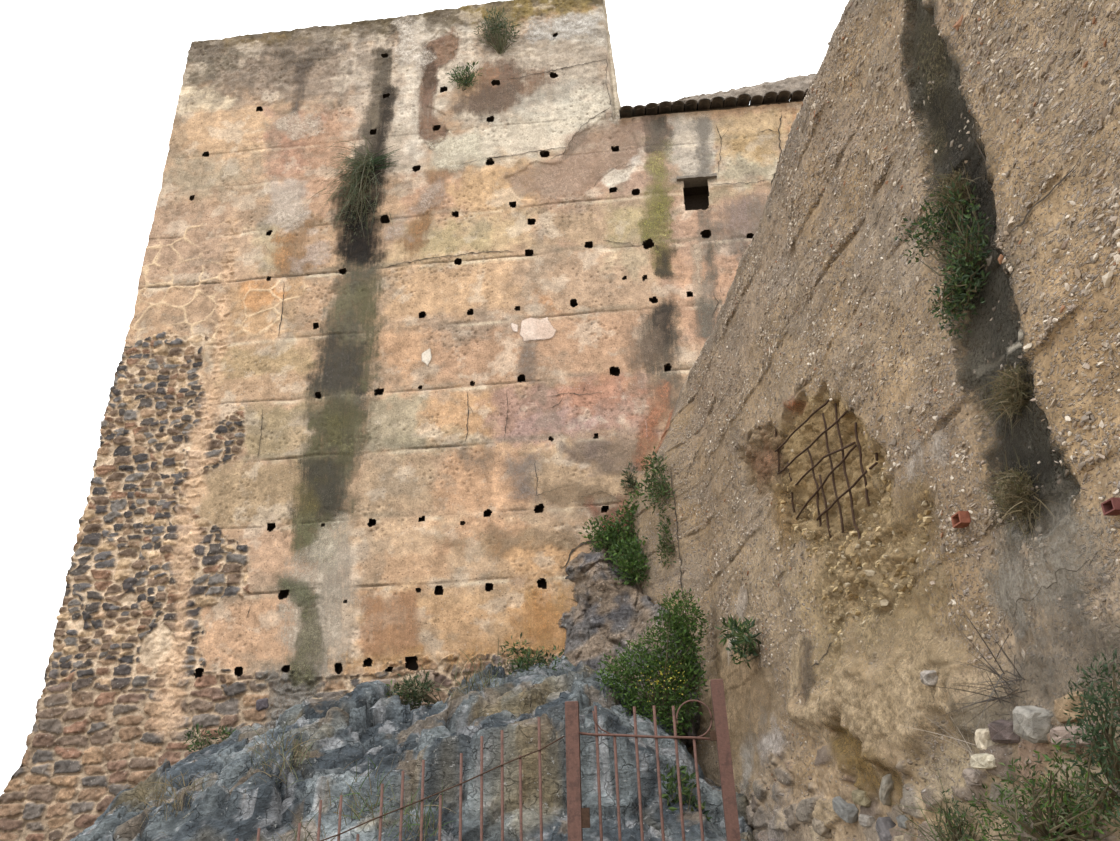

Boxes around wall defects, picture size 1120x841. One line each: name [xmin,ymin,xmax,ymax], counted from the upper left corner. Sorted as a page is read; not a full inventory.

leakage [527,13,599,40]
leakage [644,115,673,152]
leakage [655,247,673,277]
leakage [691,195,764,337]
leakage [258,19,486,725]
leakage [628,300,682,409]
leakage [900,0,1120,698]
spalling [744,387,937,666]